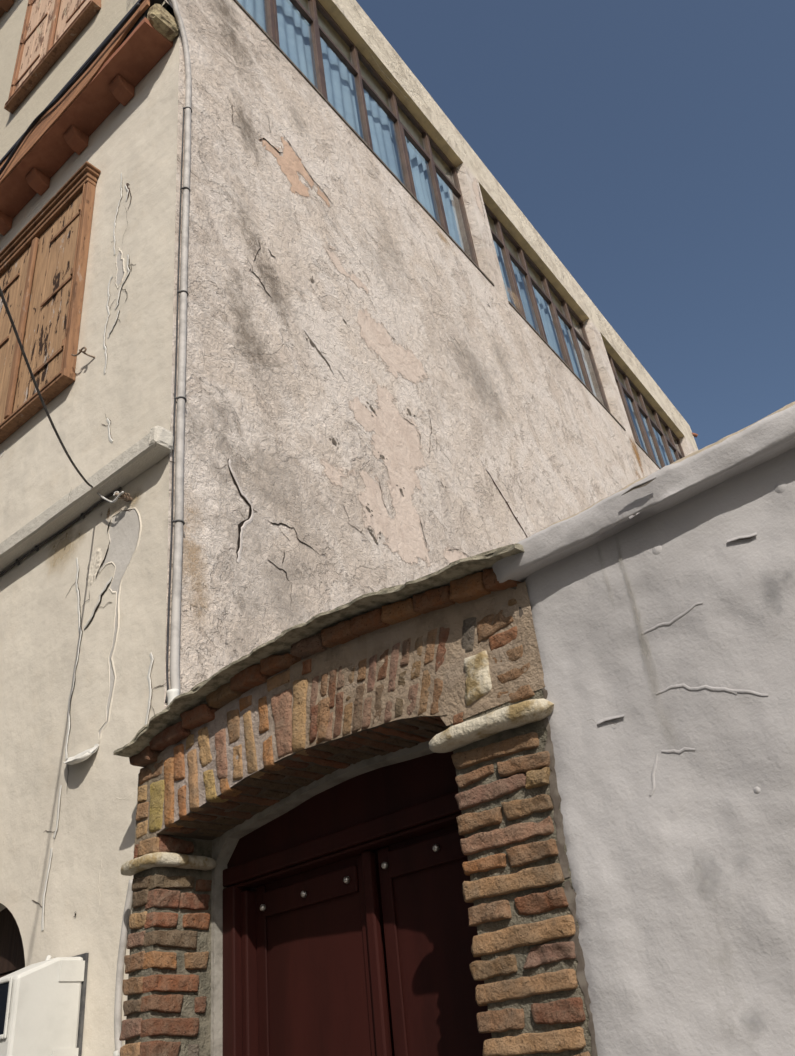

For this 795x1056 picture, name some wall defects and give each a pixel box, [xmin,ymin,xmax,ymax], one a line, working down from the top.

peeling [258,136,334,207]
crack [103,173,136,374]
crack [217,459,327,601]
peeling [444,544,471,564]
crack [486,468,528,537]
crack [32,557,113,931]